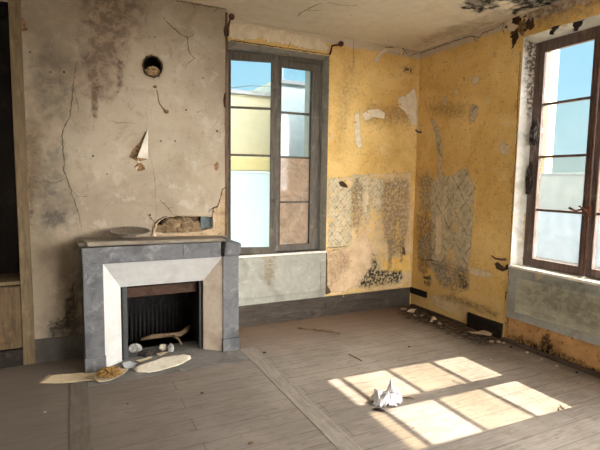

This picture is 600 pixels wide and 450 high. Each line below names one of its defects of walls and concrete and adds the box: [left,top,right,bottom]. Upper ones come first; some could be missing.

damp [461,0,558,14]
damp [83,0,137,117]
peeling [224,22,329,53]
spalling [505,13,536,117]
crack [35,62,86,230]
peeling [130,130,148,171]
peeling [355,109,385,149]
peeling [398,89,418,126]
spalling [153,188,226,236]
damp [359,180,408,288]
peeling [325,118,509,296]
damp [513,334,600,373]